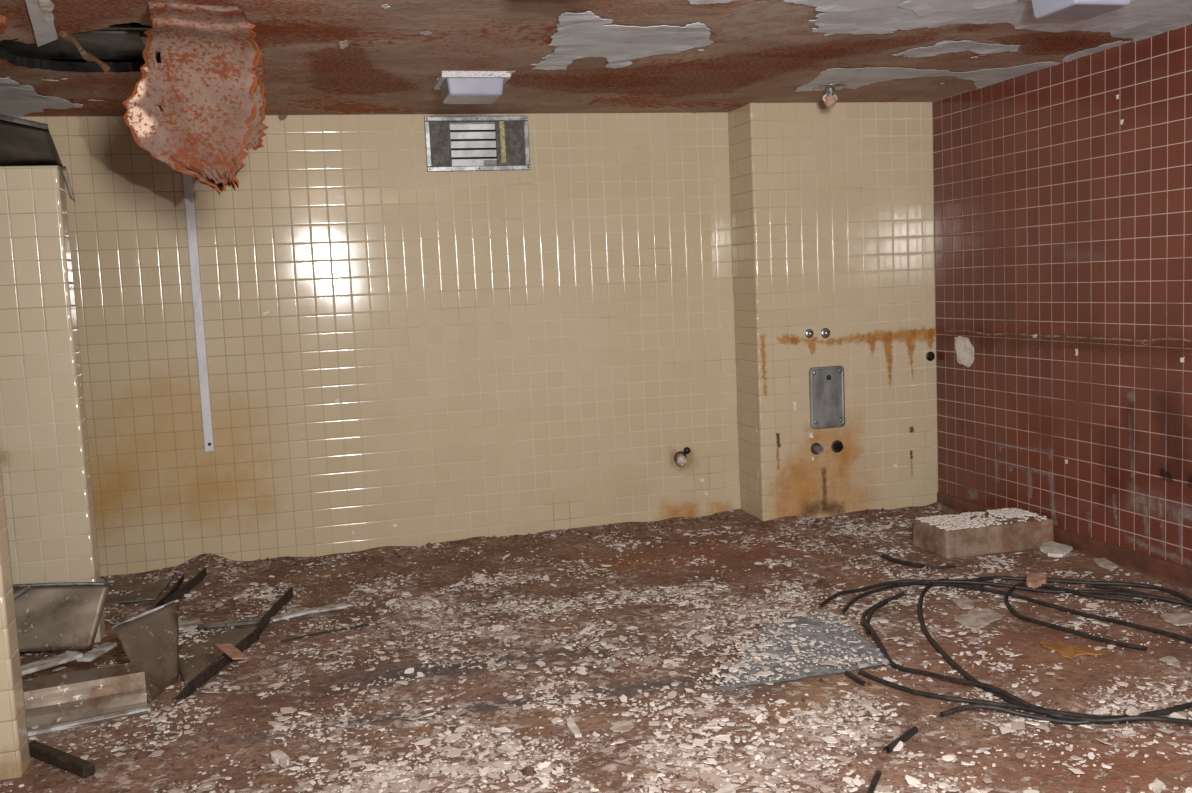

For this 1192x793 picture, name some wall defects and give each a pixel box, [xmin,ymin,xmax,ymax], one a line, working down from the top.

peeling [530,0,1192,92]
peeling [0,78,102,117]
rust [781,329,936,379]